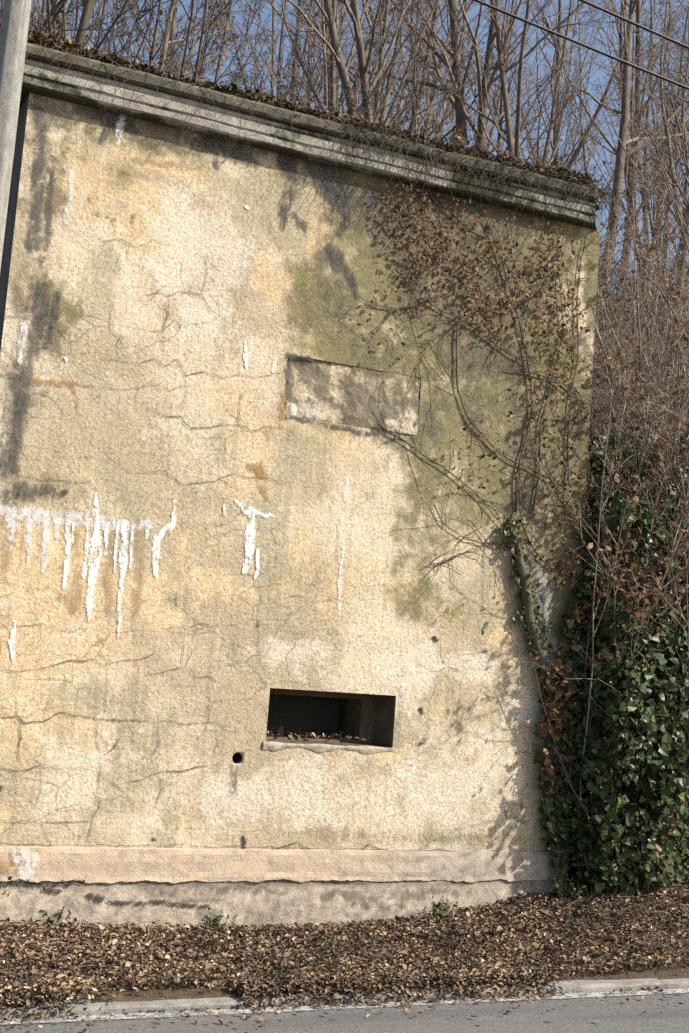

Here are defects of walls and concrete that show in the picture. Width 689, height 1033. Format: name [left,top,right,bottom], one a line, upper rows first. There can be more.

damp [26,105,73,258]
damp [277,153,378,235]
damp [326,245,360,299]
damp [0,275,68,506]
crack [8,264,284,507]
damp [285,353,417,436]
rust [247,462,269,498]
damp [62,493,176,636]
crack [0,582,500,852]